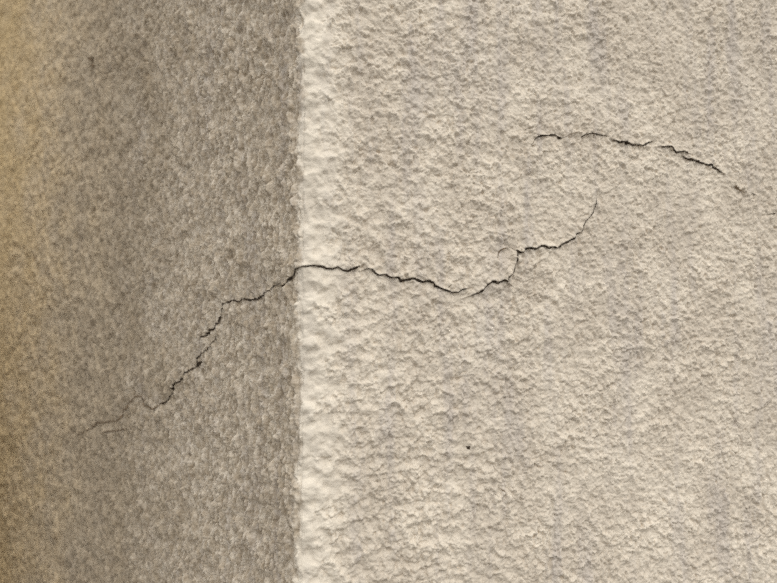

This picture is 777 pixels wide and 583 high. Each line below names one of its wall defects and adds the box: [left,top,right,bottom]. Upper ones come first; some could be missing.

crack [533,132,756,195]
crack [78,197,597,435]